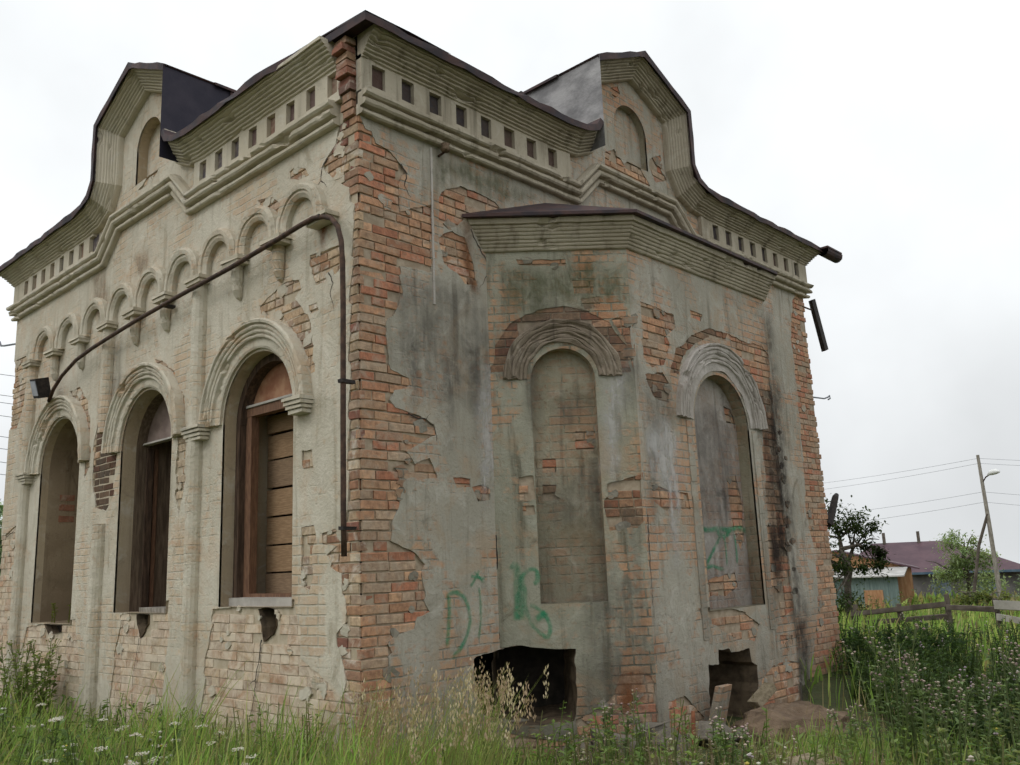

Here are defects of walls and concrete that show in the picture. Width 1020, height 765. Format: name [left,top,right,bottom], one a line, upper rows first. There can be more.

spalling [201,91,498,762]
spalling [491,280,727,403]
spalling [604,472,689,532]
spalling [669,295,843,739]
water stain [762,368,807,695]
spalling [474,645,658,757]